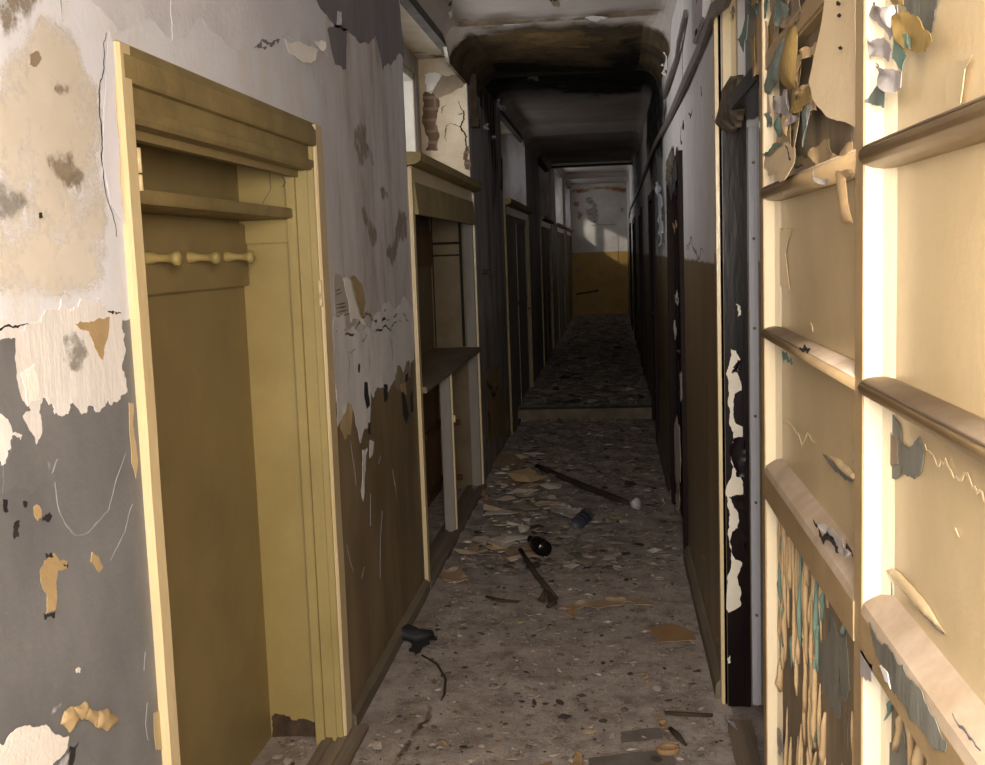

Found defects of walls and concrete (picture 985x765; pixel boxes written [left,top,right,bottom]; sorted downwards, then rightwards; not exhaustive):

water stain [456,9,659,73]
spalling [422,72,466,151]
peeling [729,0,939,224]
water stain [0,187,25,216]
water stain [48,156,83,186]
flaking render [0,0,415,523]
peeling [725,349,747,612]
crack [925,444,985,503]
peeling [40,553,69,620]
peeling [775,520,947,765]
peeling [0,701,121,765]
peeling [153,711,162,750]